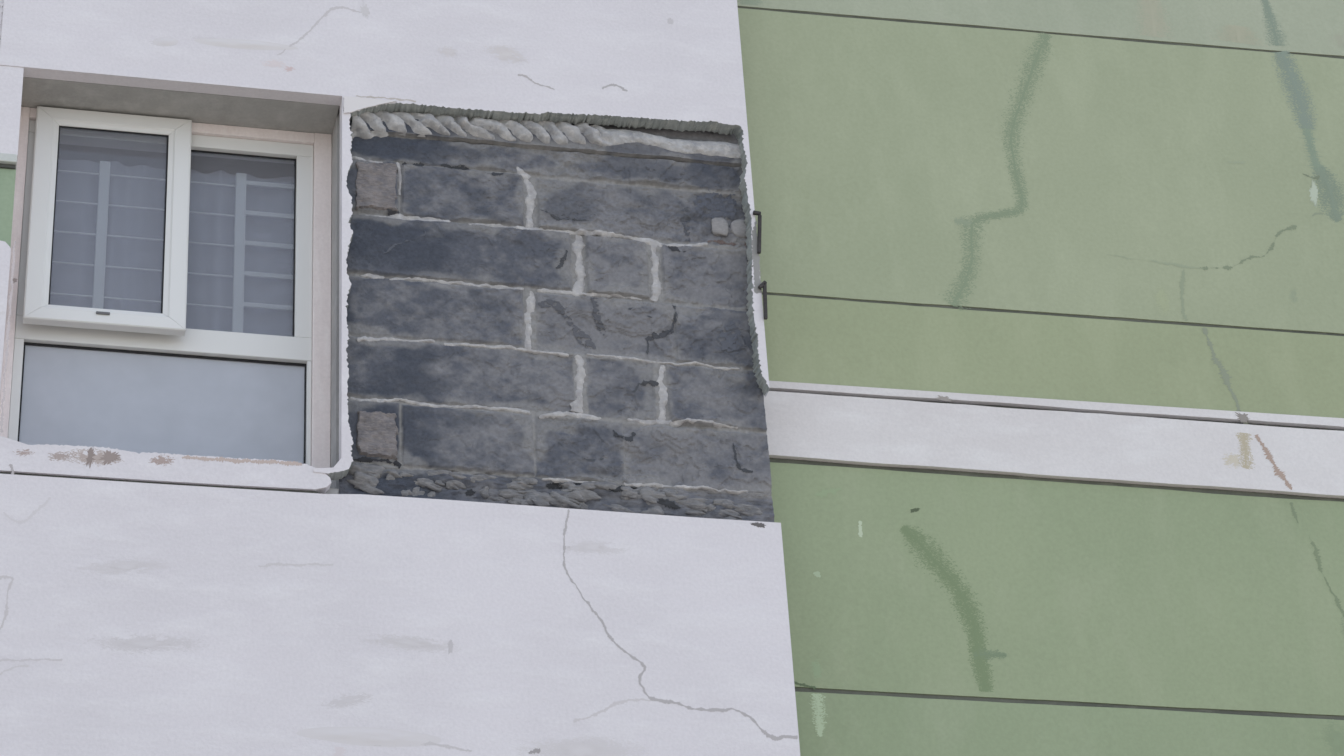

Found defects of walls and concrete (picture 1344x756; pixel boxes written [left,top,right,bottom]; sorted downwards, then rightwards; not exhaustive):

crack [277,6,370,55]
leakage [939,32,1053,311]
crack [1107,212,1324,270]
leakage [1260,0,1344,223]
rust [1222,432,1255,470]
crack [1202,328,1344,617]
crack [0,575,63,675]
crack [563,509,798,741]
leakage [900,525,1007,692]